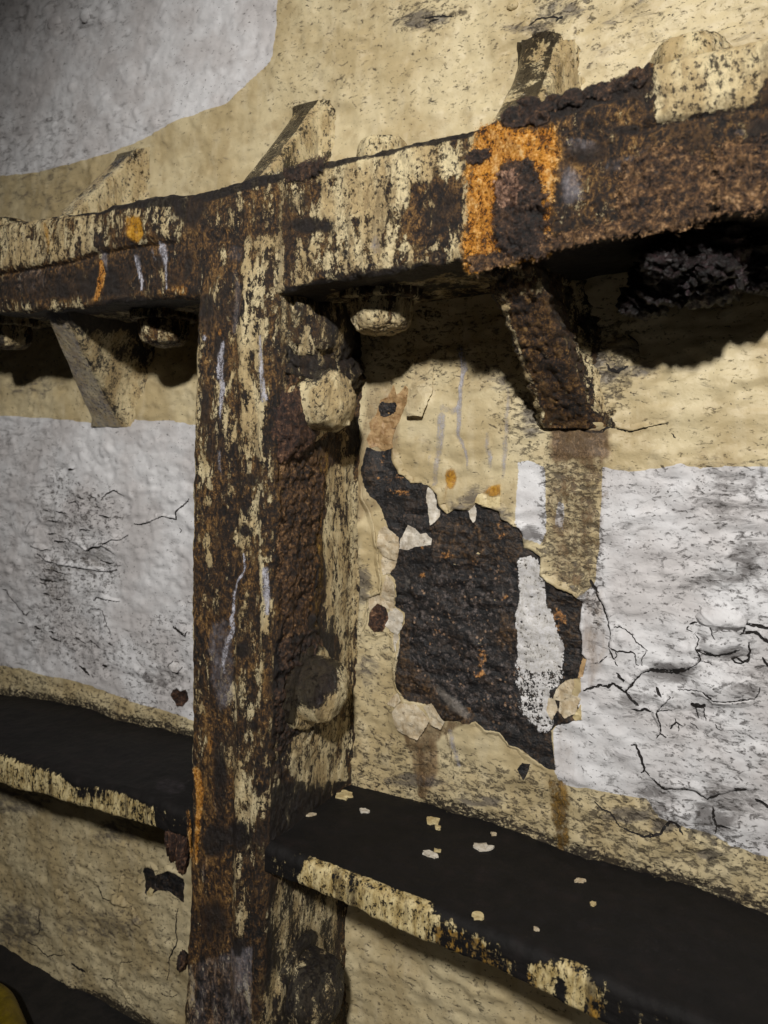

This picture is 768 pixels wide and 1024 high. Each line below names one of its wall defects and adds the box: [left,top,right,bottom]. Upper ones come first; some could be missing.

corrosion [459,66,768,275]
crack [134,499,189,533]
corrosion [274,432,329,752]
peeling [357,345,593,780]
crack [583,580,768,838]
peeling [141,861,185,902]
peeling [422,848,441,859]